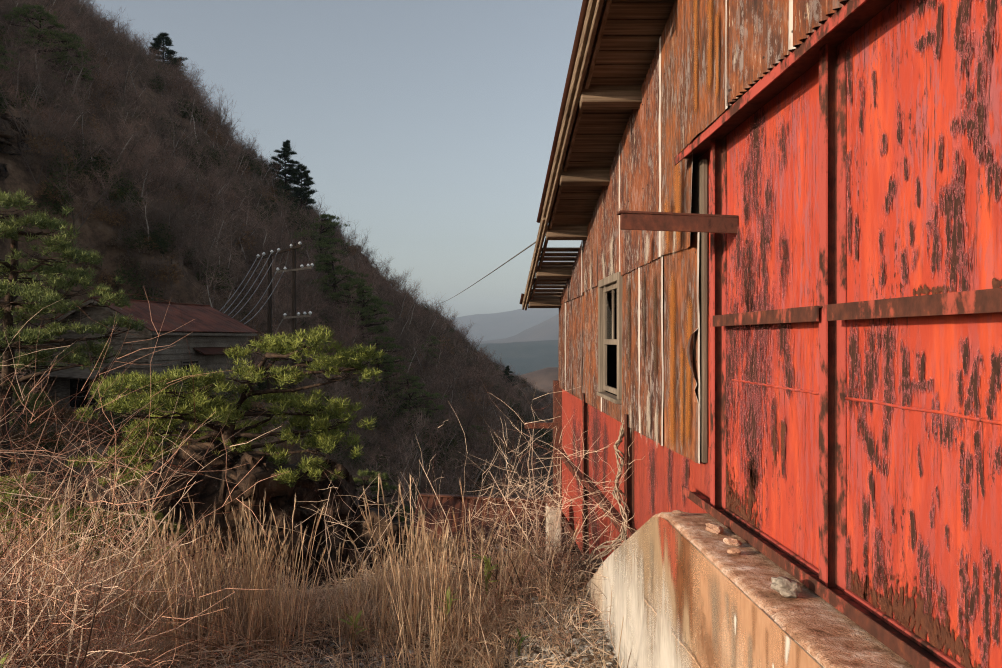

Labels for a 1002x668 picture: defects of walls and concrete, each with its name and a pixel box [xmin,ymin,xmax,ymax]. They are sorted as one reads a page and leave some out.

peeling [846,47,877,134]
peeling [880,0,1002,293]
peeling [845,150,859,262]
water stain [643,277,656,372]
corrosion [669,278,692,446]
corrosion [913,284,955,296]
corrosion [726,425,762,528]
corrosion [771,420,786,466]
corrosion [659,517,822,668]
corrosion [846,555,981,668]